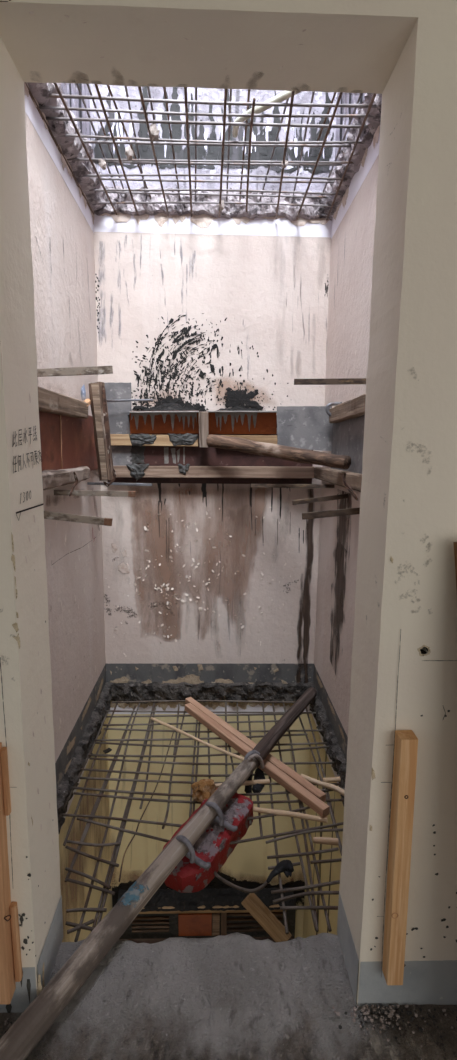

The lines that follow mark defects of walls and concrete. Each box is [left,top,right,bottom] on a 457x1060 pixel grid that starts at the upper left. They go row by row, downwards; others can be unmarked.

spalling [24,82,382,228]
leakage [218,381,255,400]
leakage [104,483,291,640]
leakage [283,489,314,683]
leakage [330,491,352,675]